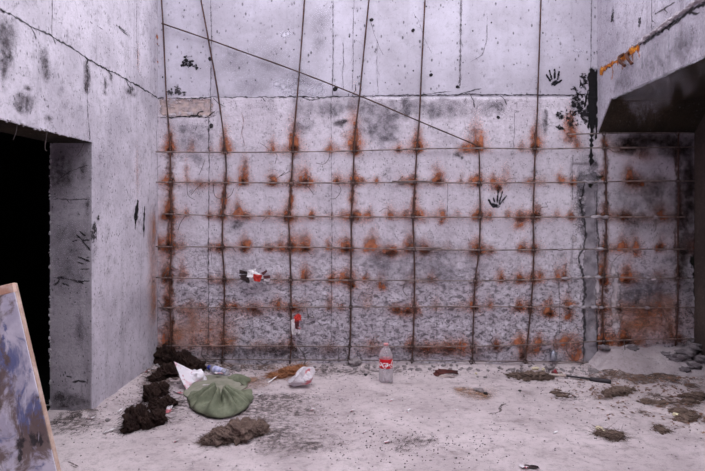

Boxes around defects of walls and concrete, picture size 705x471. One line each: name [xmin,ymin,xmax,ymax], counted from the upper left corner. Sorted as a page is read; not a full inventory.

water stain [0,24,13,77]
corrosion [600,44,640,79]
corrosion [288,133,299,154]
corrosion [347,120,362,155]
corrosion [459,130,484,152]
corrosion [206,167,250,219]
corrosion [266,194,296,223]
crack [0,0,585,345]
corrosion [289,172,314,186]
corrosion [431,170,444,185]
water stain [622,133,695,297]
corrosion [363,239,429,257]